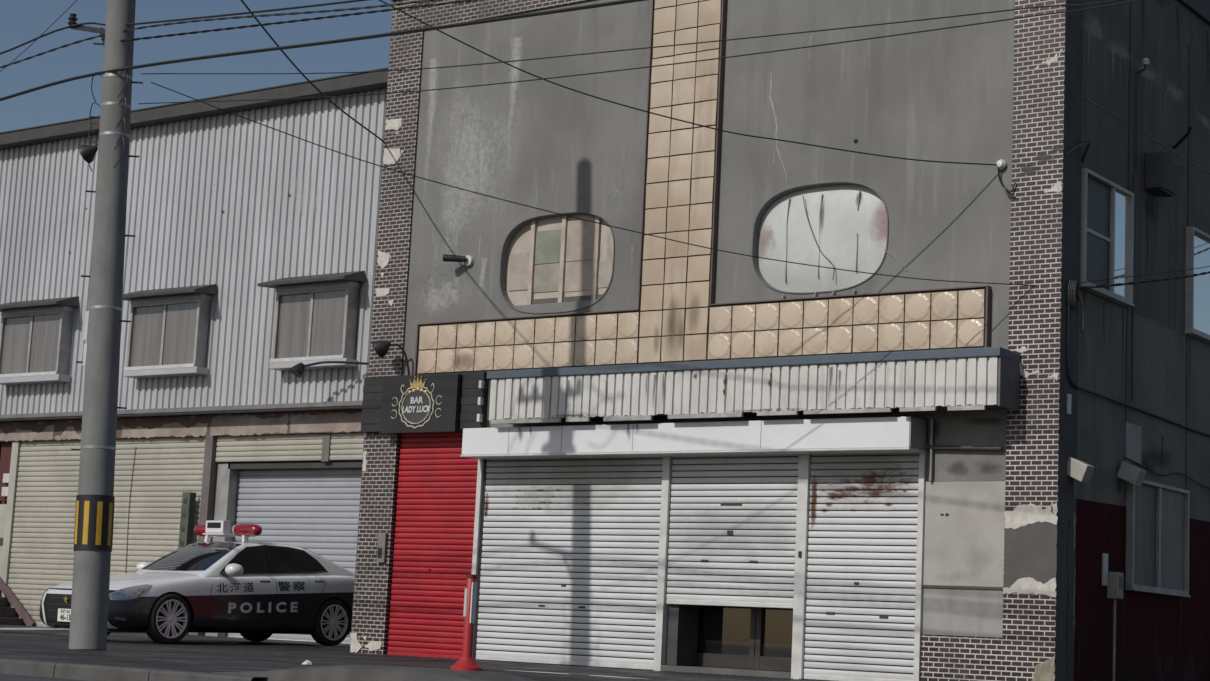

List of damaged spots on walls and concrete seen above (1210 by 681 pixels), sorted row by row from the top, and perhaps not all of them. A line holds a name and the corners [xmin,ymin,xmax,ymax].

spalling [383,118,404,165]
leakage [427,58,437,169]
leakage [443,37,521,233]
spalling [376,250,394,306]
rust [811,473,906,521]
spalling [1004,503,1058,529]